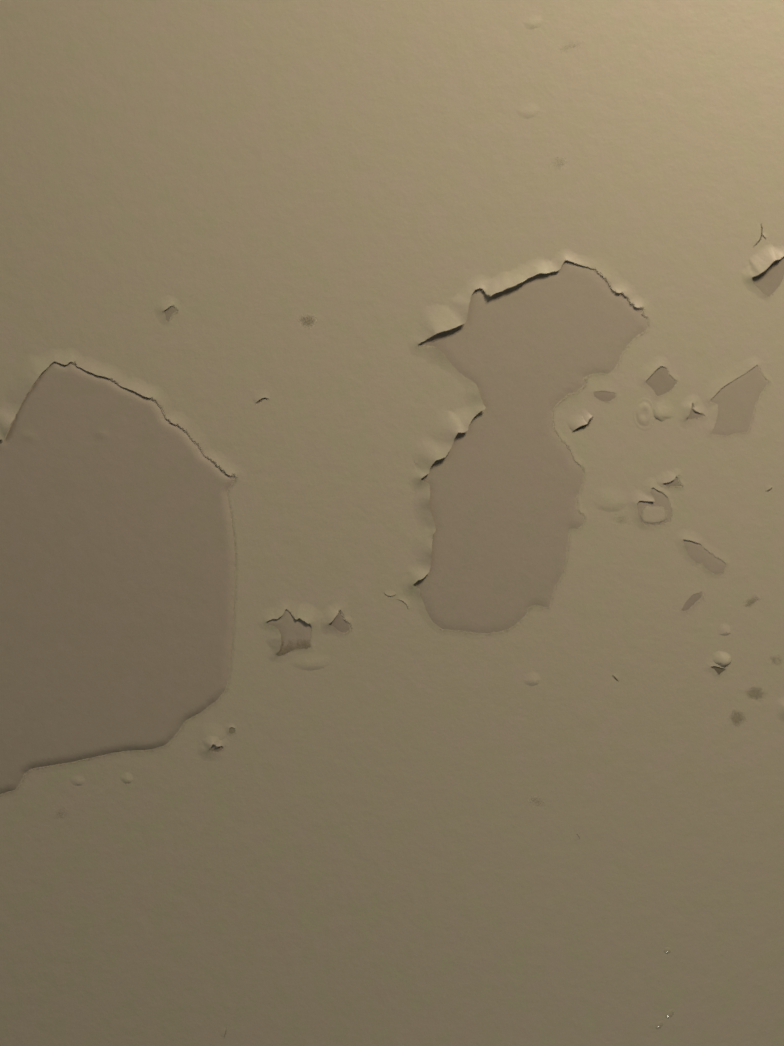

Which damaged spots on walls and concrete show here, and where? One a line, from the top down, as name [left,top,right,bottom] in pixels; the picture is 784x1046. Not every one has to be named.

peeling [740,244,784,302]
peeling [636,355,708,429]
peeling [400,249,656,639]
peeling [0,348,248,801]
peeling [257,598,355,663]